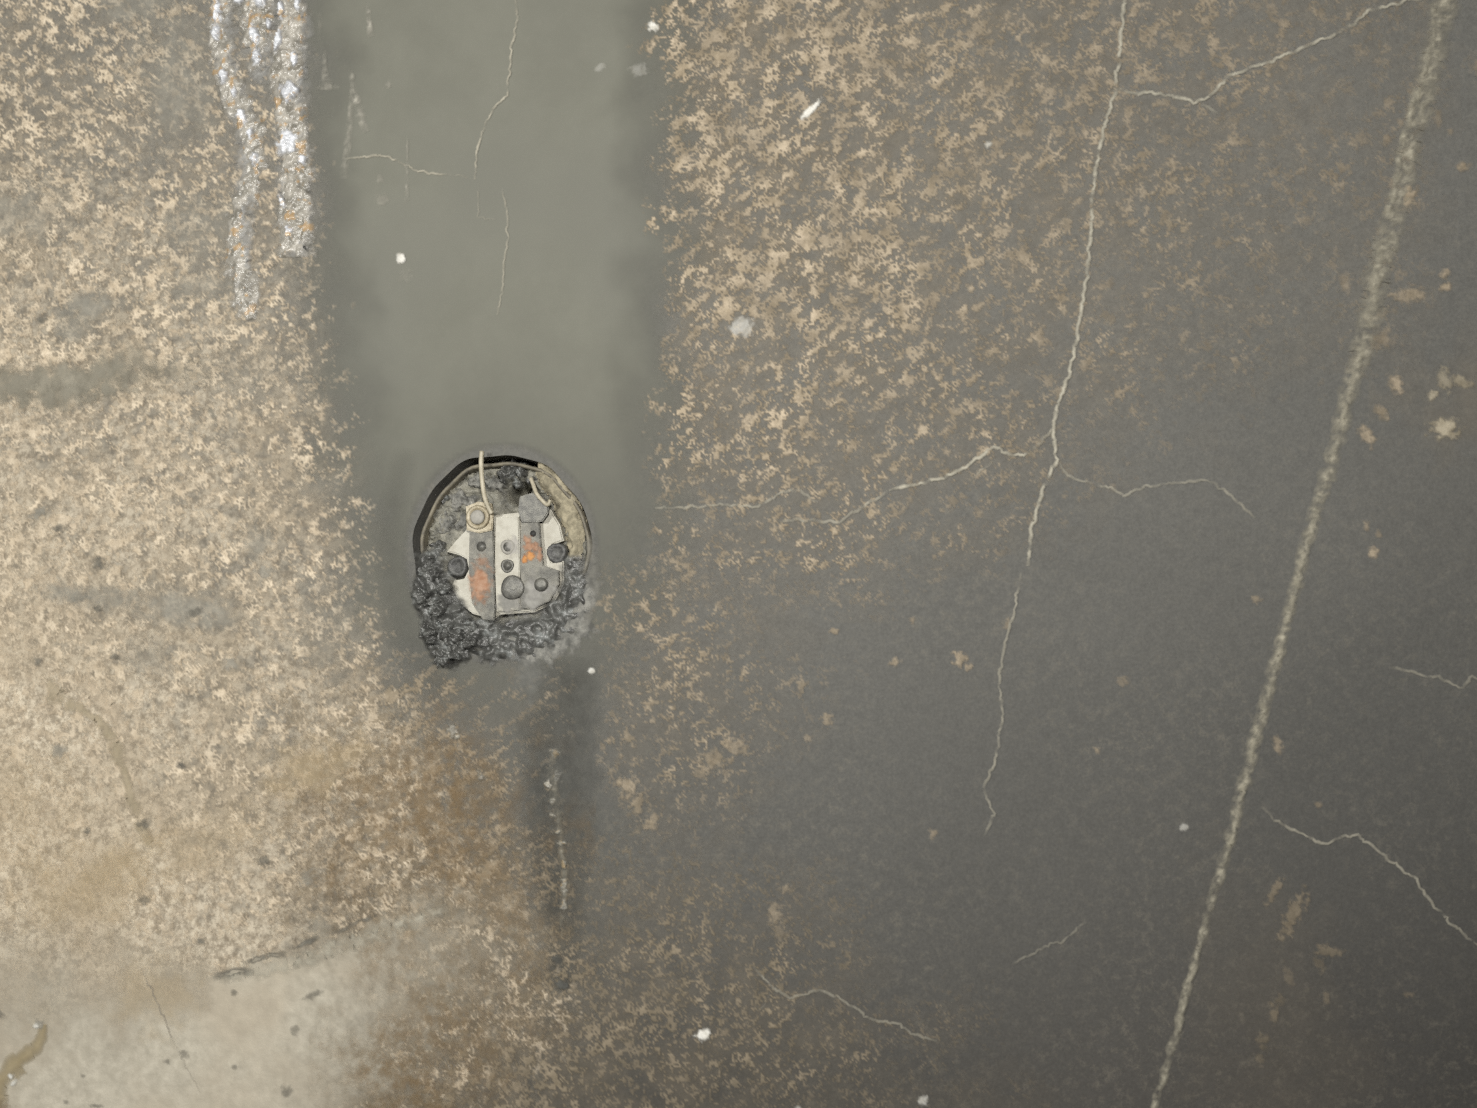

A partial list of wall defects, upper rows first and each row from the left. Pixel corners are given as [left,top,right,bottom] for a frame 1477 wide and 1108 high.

water stain [234,0,314,258]
crack [678,0,1407,559]
crack [1279,821,1462,932]